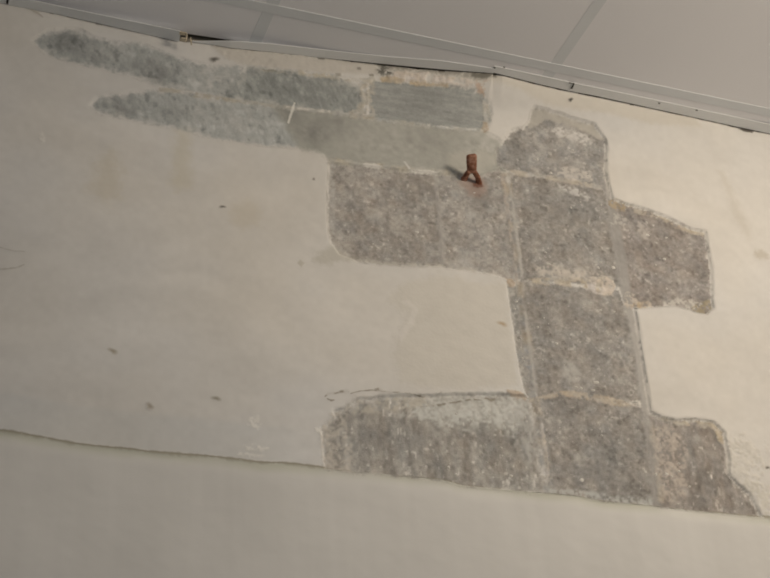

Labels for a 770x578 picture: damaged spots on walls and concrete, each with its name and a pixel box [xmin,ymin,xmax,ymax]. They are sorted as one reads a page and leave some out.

spalling [33,26,504,175]
spalling [310,105,770,518]